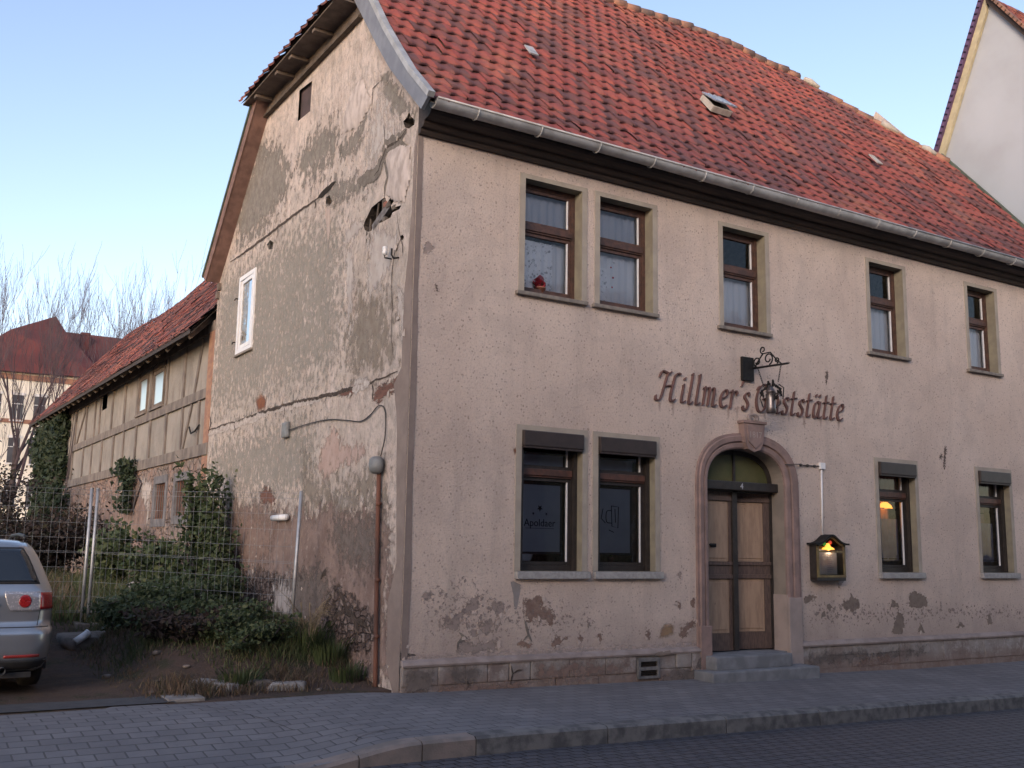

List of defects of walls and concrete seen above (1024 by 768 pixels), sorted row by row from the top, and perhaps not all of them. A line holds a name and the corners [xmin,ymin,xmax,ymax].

peeling [364,89,415,170]
crack [230,79,408,262]
peeling [364,197,401,303]
crack [208,221,403,436]
flaking render [373,377,397,405]
flaking render [205,485,394,687]
spalling [443,581,583,655]
spalling [675,599,697,638]
spalling [804,581,860,617]
spalling [891,591,929,634]